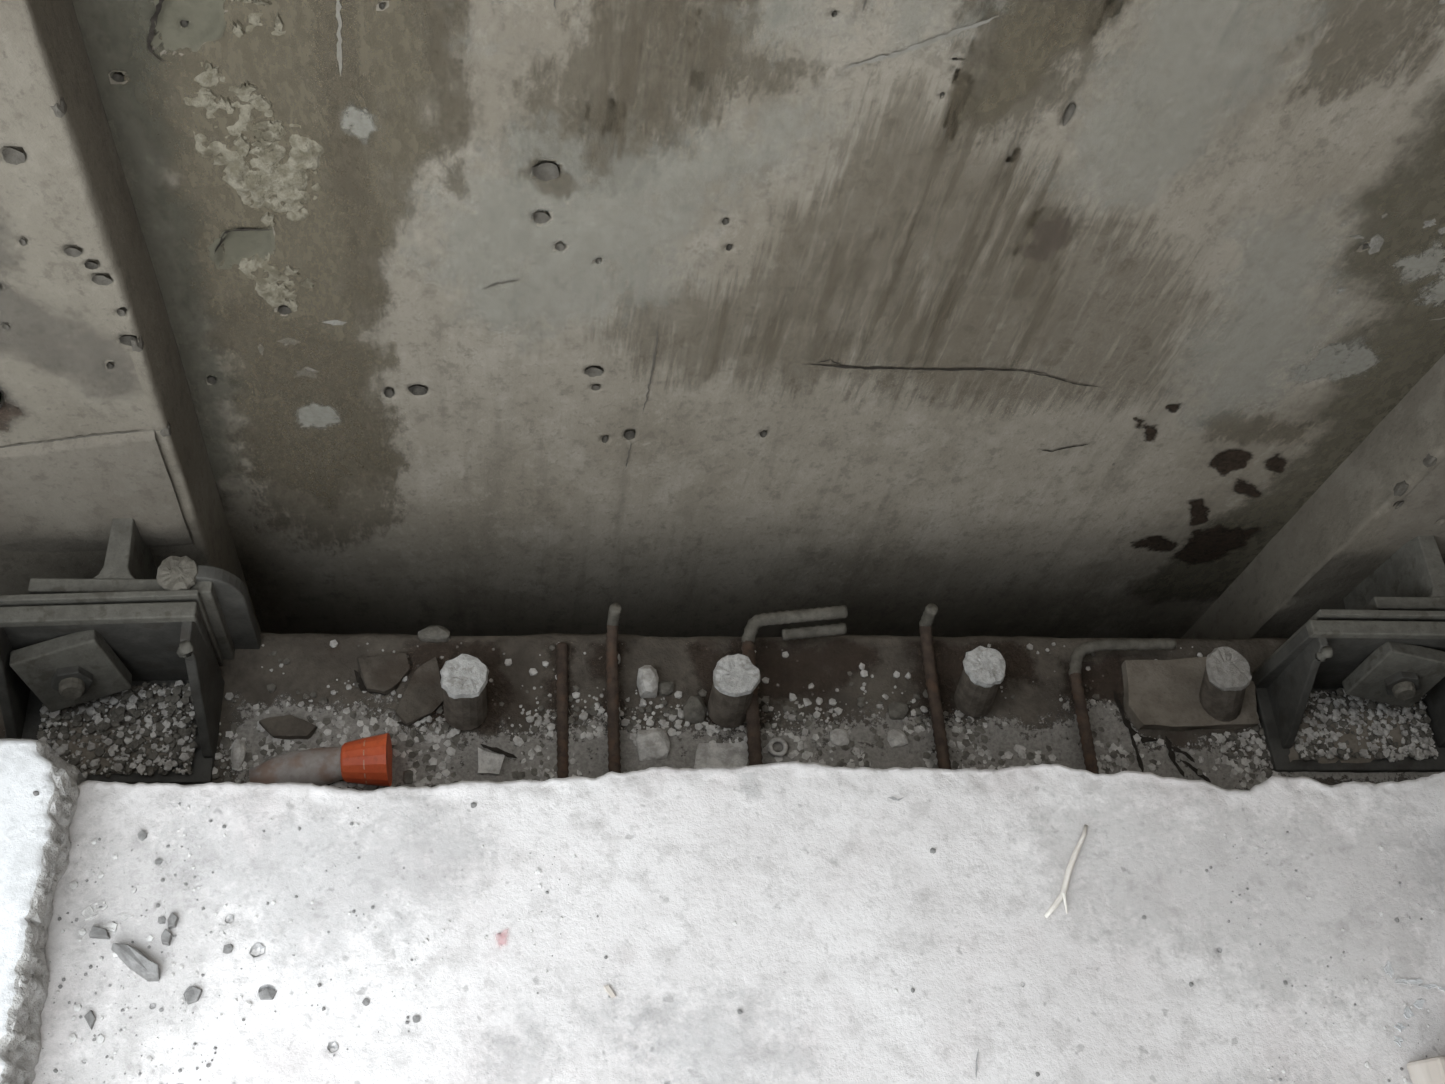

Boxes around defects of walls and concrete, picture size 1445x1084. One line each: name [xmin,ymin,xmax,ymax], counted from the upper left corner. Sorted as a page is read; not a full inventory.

peeling [147,0,325,227]
peeling [340,105,376,139]
water stain [522,0,801,196]
water stain [952,0,1122,124]
water stain [74,0,467,544]
peeling [238,252,316,312]
peeling [1394,218,1445,306]
crack [811,359,1101,388]
water stain [1131,94,1445,602]
corrosion [688,638,878,735]
corrosion [908,641,1038,728]
corrosion [1060,656,1124,711]